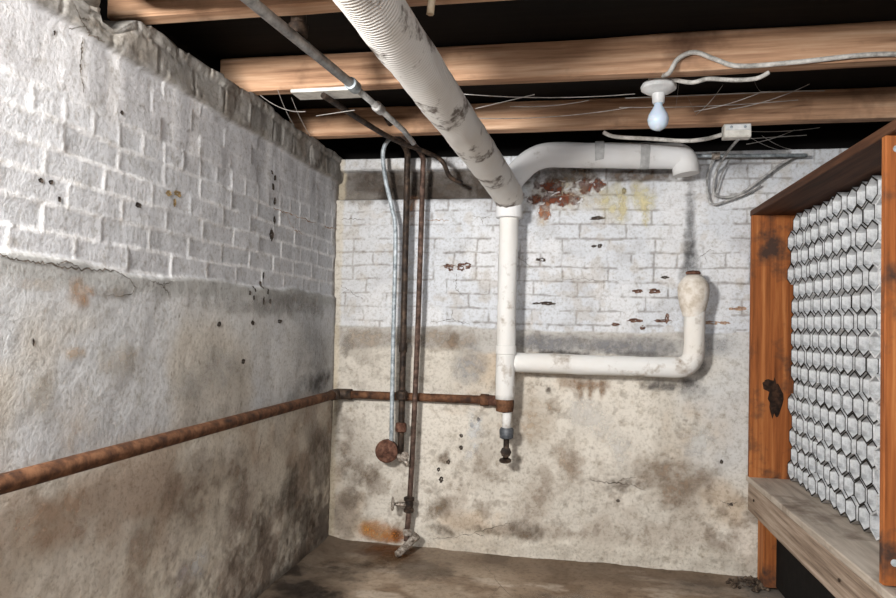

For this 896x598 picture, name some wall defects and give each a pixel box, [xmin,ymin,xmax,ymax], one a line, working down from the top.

peeling [523,178,606,220]
crack [0,253,170,302]
damp [396,330,471,349]
damp [528,336,667,357]
corrosion [364,525,411,563]
damp [509,524,541,539]